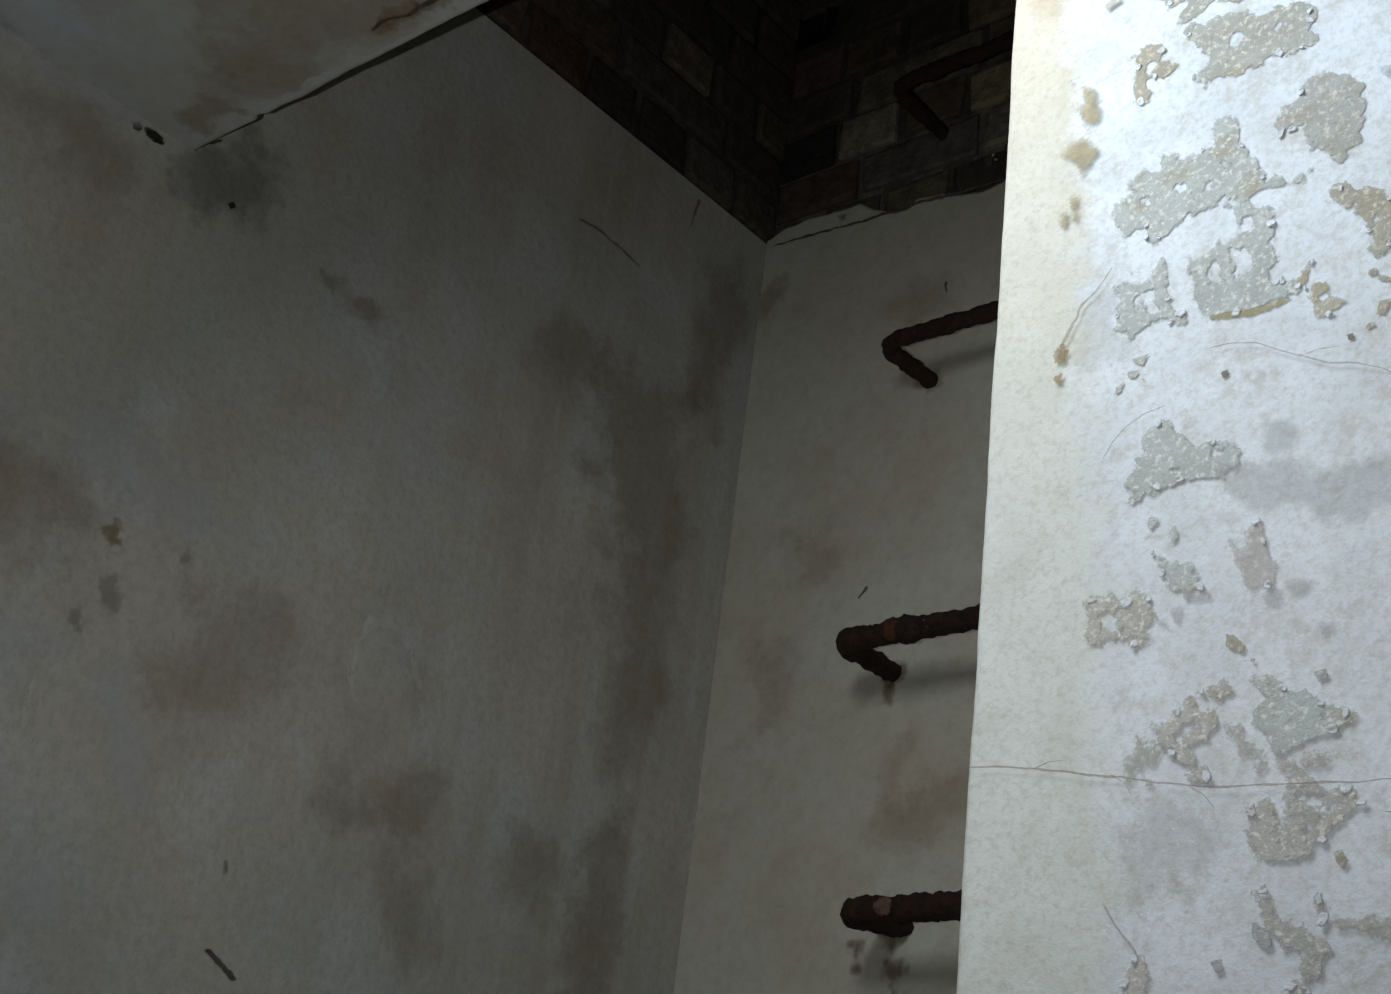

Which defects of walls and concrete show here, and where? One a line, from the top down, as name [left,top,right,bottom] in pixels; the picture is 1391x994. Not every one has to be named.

crack [372,0,438,31]
peeling [1131,43,1178,106]
peeling [1162,0,1318,89]
peeling [1111,72,1367,340]
peeling [1329,181,1391,340]
rust [1053,344,1069,384]
peeling [1124,419,1241,505]
peeling [1228,517,1276,592]
peeling [1082,590,1157,648]
crack [970,760,1391,813]
peeling [1123,634,1367,868]
peeling [1251,884,1391,994]